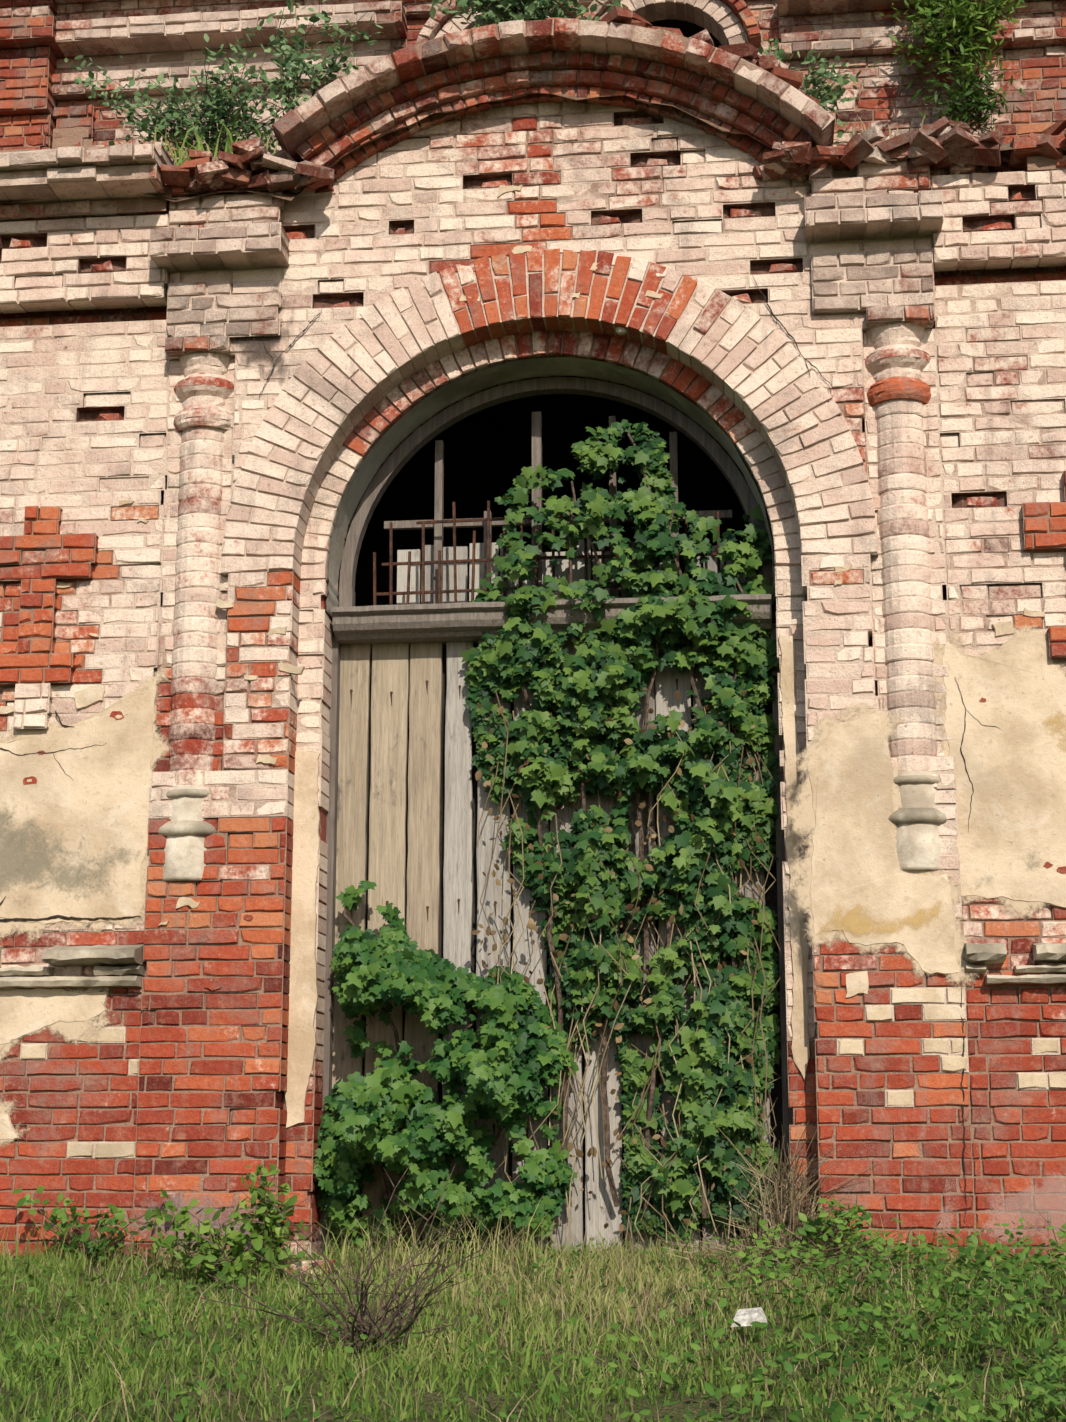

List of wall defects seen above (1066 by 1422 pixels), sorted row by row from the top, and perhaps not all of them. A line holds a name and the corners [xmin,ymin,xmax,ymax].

peeling [93,551,120,579]
crack [0,711,106,778]
crack [955,679,998,830]
water stain [0,813,123,890]
flaking render [0,572,320,1128]
flaking render [779,608,1066,1079]
flaking render [0,1102,23,1146]
flaking render [67,1142,136,1157]
flaking render [887,1091,913,1106]
flaking render [1017,1073,1066,1088]